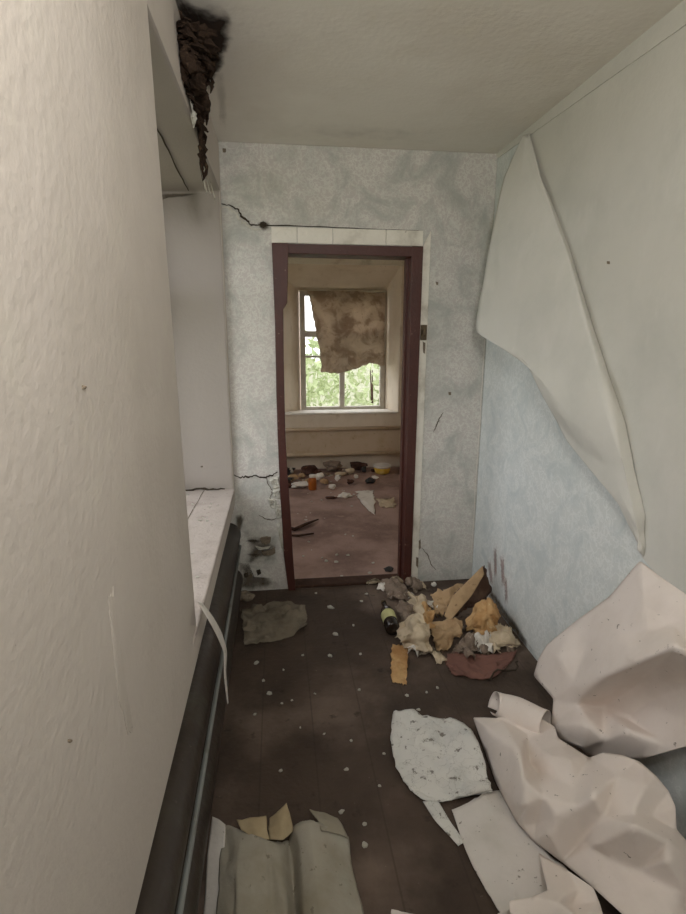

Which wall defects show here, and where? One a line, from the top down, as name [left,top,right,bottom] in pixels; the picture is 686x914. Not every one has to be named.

crack [221,203,419,231]
crack [185,472,278,520]